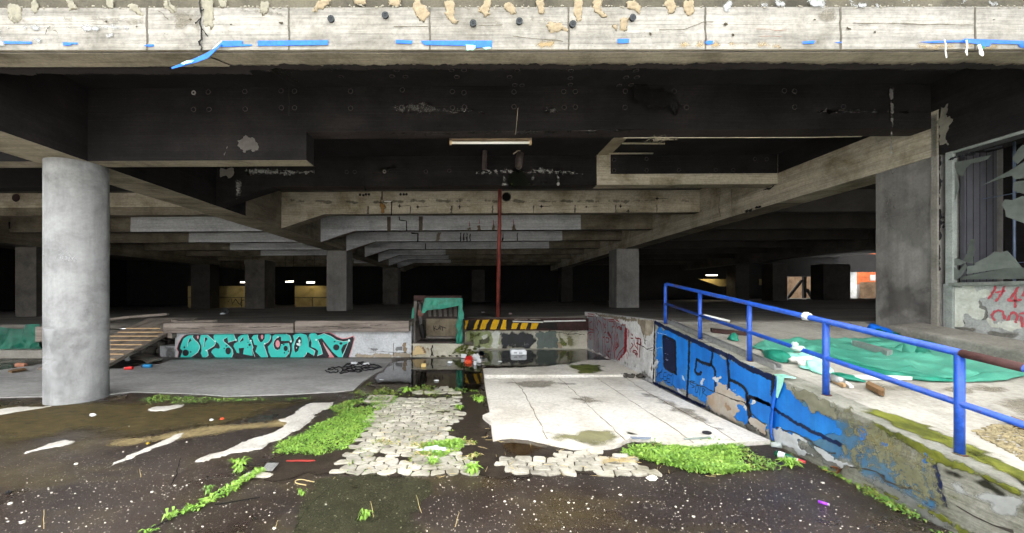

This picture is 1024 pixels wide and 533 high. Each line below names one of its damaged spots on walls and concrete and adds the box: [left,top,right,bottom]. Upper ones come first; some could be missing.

crack [158,0,230,65]
peeling [224,135,259,155]
spalling [595,313,654,341]
peeling [955,286,1022,332]
corrosion [957,349,1024,372]
peeling [700,376,853,468]